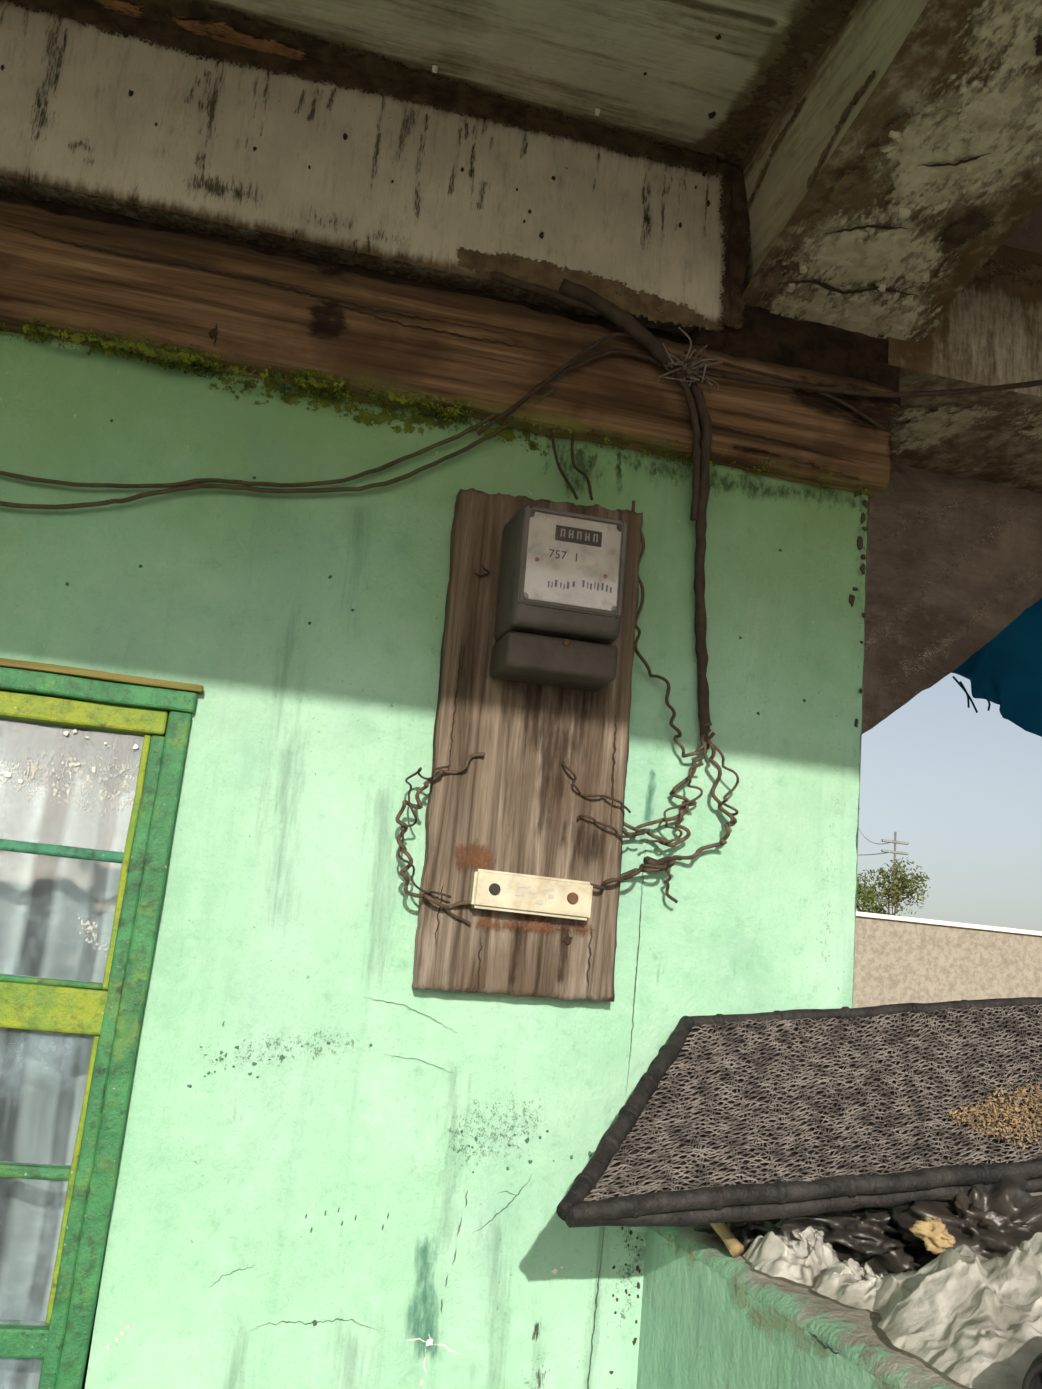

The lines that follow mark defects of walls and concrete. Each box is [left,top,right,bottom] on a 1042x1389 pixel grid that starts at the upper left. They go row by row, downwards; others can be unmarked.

water stain [663,0,776,27]
water stain [31,10,67,139]
water stain [184,59,224,133]
spalling [66,0,694,154]
water stain [188,153,257,203]
water stain [396,109,428,217]
water stain [448,116,493,210]
peeling [747,96,806,208]
crack [918,153,991,167]
crack [718,161,918,330]
crack [250,1318,375,1331]
water stain [409,1245,434,1354]